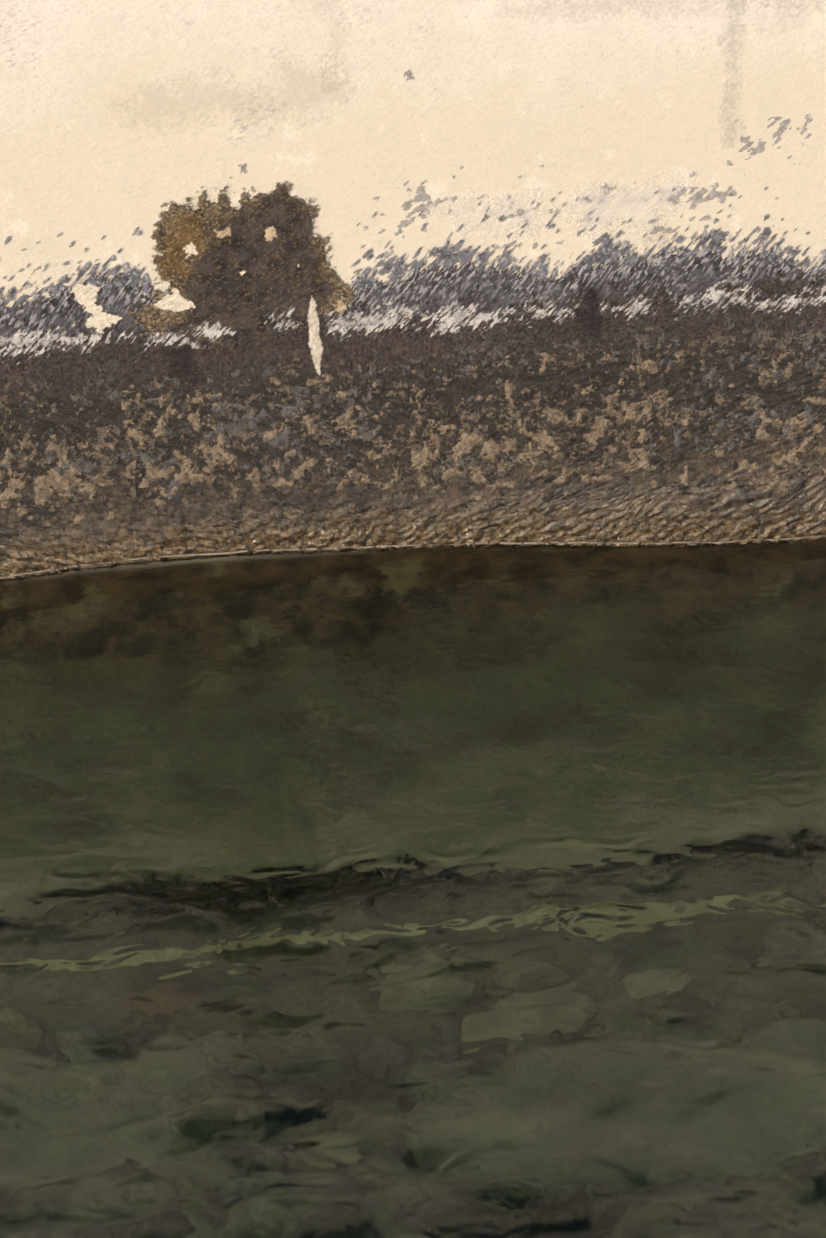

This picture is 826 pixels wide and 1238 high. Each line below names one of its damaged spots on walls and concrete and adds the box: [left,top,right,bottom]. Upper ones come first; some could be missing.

peeling [73,283,123,334]
peeling [0,295,826,526]